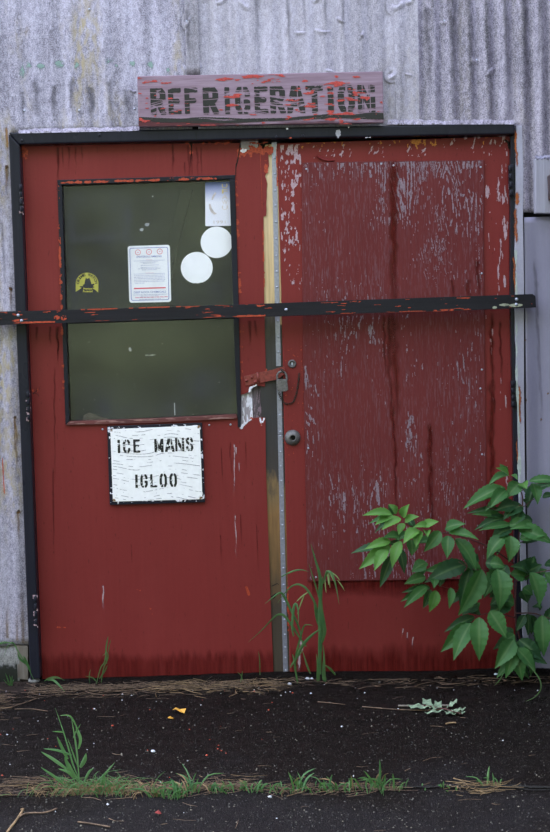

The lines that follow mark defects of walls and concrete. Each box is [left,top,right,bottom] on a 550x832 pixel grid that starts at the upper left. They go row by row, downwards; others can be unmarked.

peeling [185,74,523,317]
peeling [70,384,265,439]
peeling [280,277,387,457]
peeling [321,471,400,538]
peeling [401,412,425,487]
peeling [416,330,485,524]
peeling [493,322,521,503]